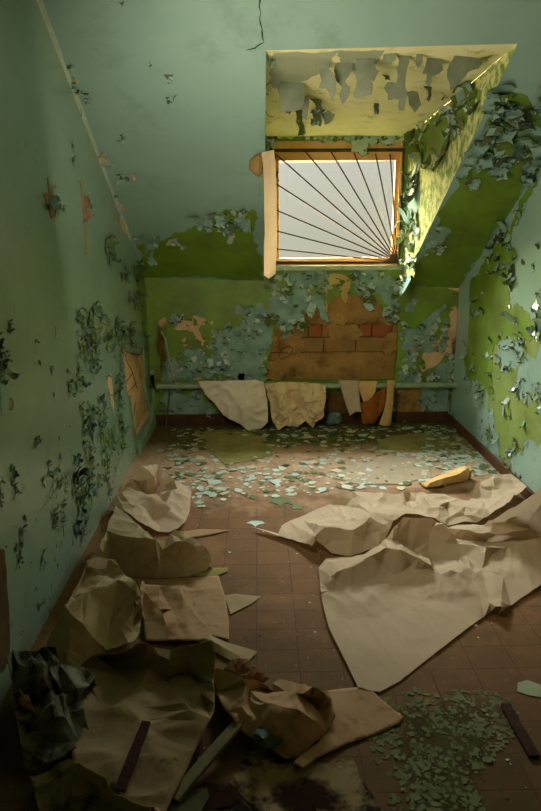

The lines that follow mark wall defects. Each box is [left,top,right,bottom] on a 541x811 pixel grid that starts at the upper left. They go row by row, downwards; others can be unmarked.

crack [248,0,264,50]
peeling [42,53,541,543]
peeling [0,319,20,386]